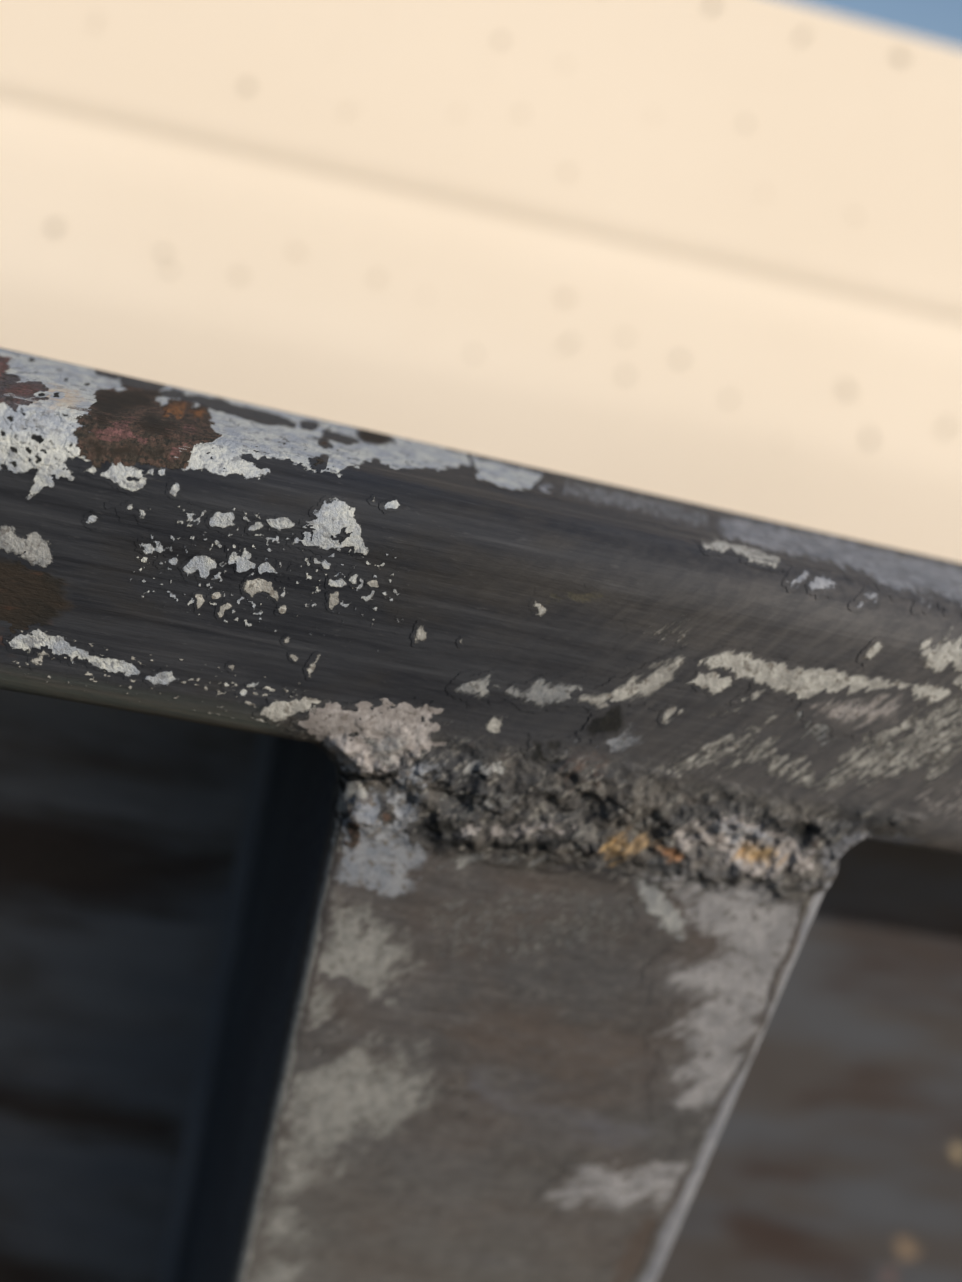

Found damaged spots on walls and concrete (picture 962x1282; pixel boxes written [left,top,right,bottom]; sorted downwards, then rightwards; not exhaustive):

corrosion [0,355,225,469]
peeling [0,348,962,620]
corrosion [0,554,89,636]
peeling [3,623,183,688]
peeling [410,620,434,648]
corrosion [0,689,258,962]
corrosion [587,820,688,871]
peeling [221,633,957,1282]